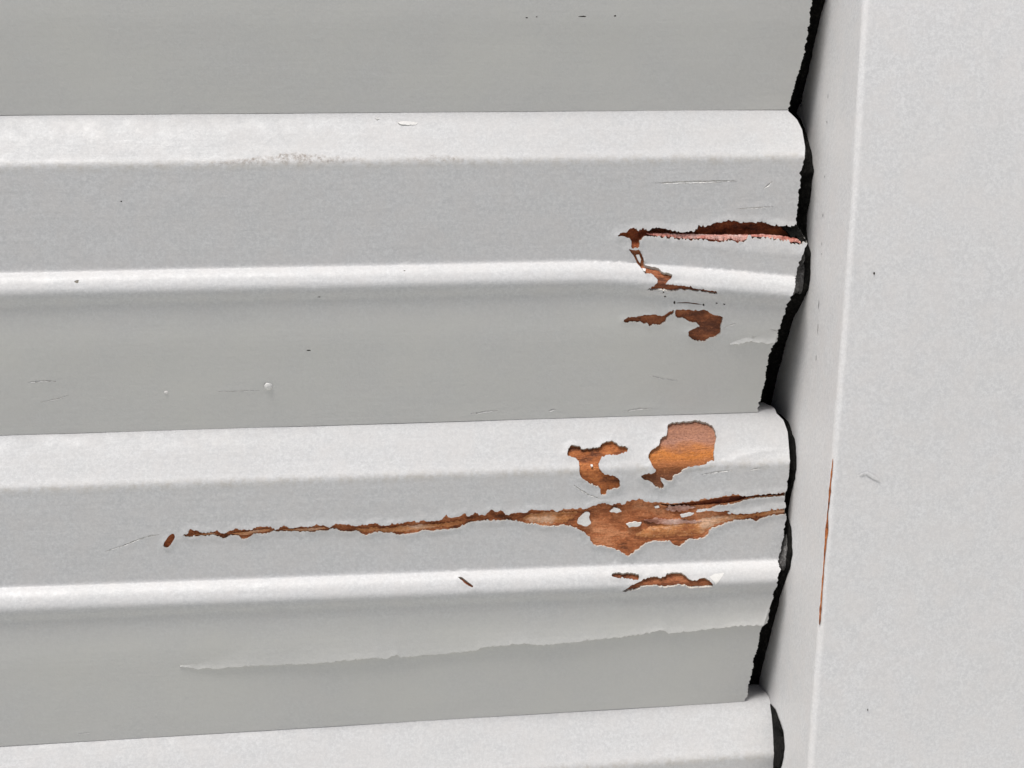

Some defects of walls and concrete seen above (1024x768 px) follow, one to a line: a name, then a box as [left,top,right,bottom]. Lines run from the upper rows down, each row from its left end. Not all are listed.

peeling [624,309,722,341]
peeling [567,441,628,495]
peeling [641,421,716,488]
peeling [612,573,724,590]